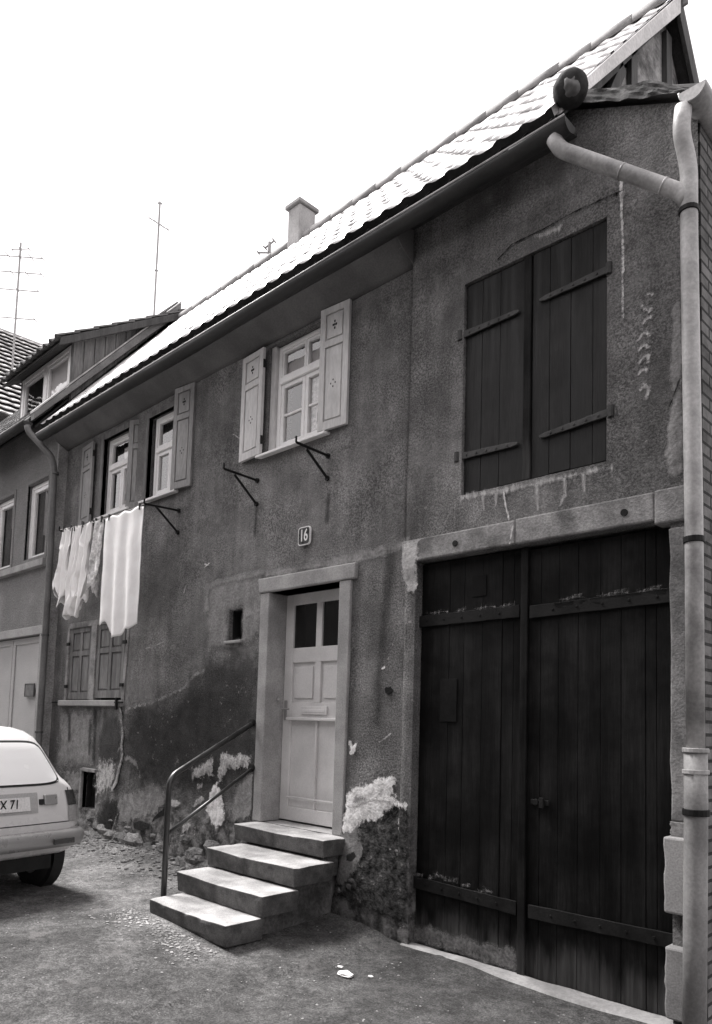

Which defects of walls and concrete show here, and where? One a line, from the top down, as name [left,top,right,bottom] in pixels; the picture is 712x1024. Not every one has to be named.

crack [498,189,624,259]
damp [460,468,598,544]
damp [57,663,256,796]
peeling [70,752,253,892]
spalling [336,776,409,921]